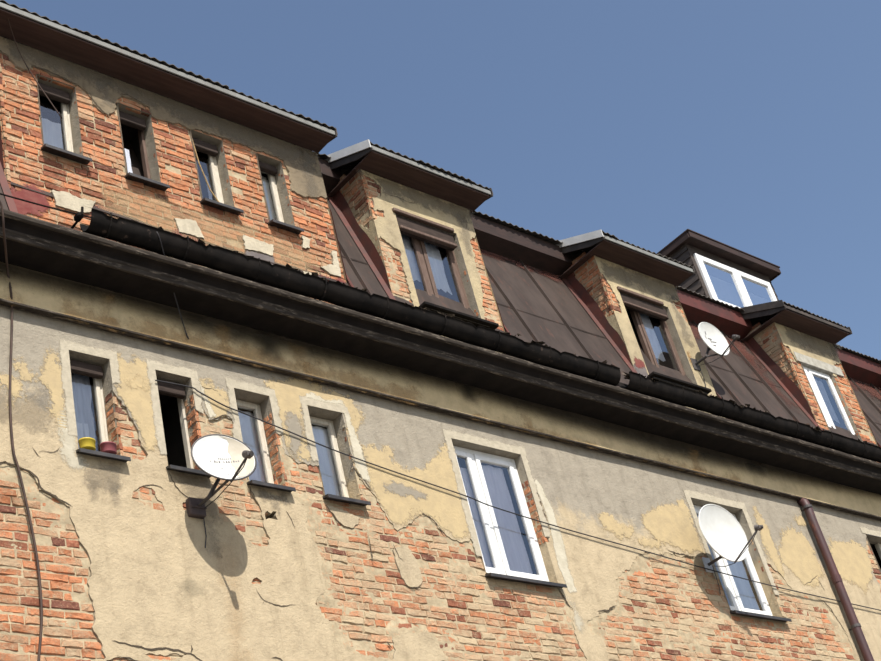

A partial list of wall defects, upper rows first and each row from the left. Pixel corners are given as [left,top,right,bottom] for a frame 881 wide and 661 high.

flaking render [0,50,346,282]
flaking render [337,169,414,307]
flaking render [569,252,622,320]
flaking render [105,353,158,460]
flaking render [748,319,829,431]
flaking render [833,363,876,444]
flaking render [0,461,134,661]
flaking render [132,486,165,511]
flaking render [264,378,861,661]
flaking render [828,538,881,595]
crack [111,640,202,661]